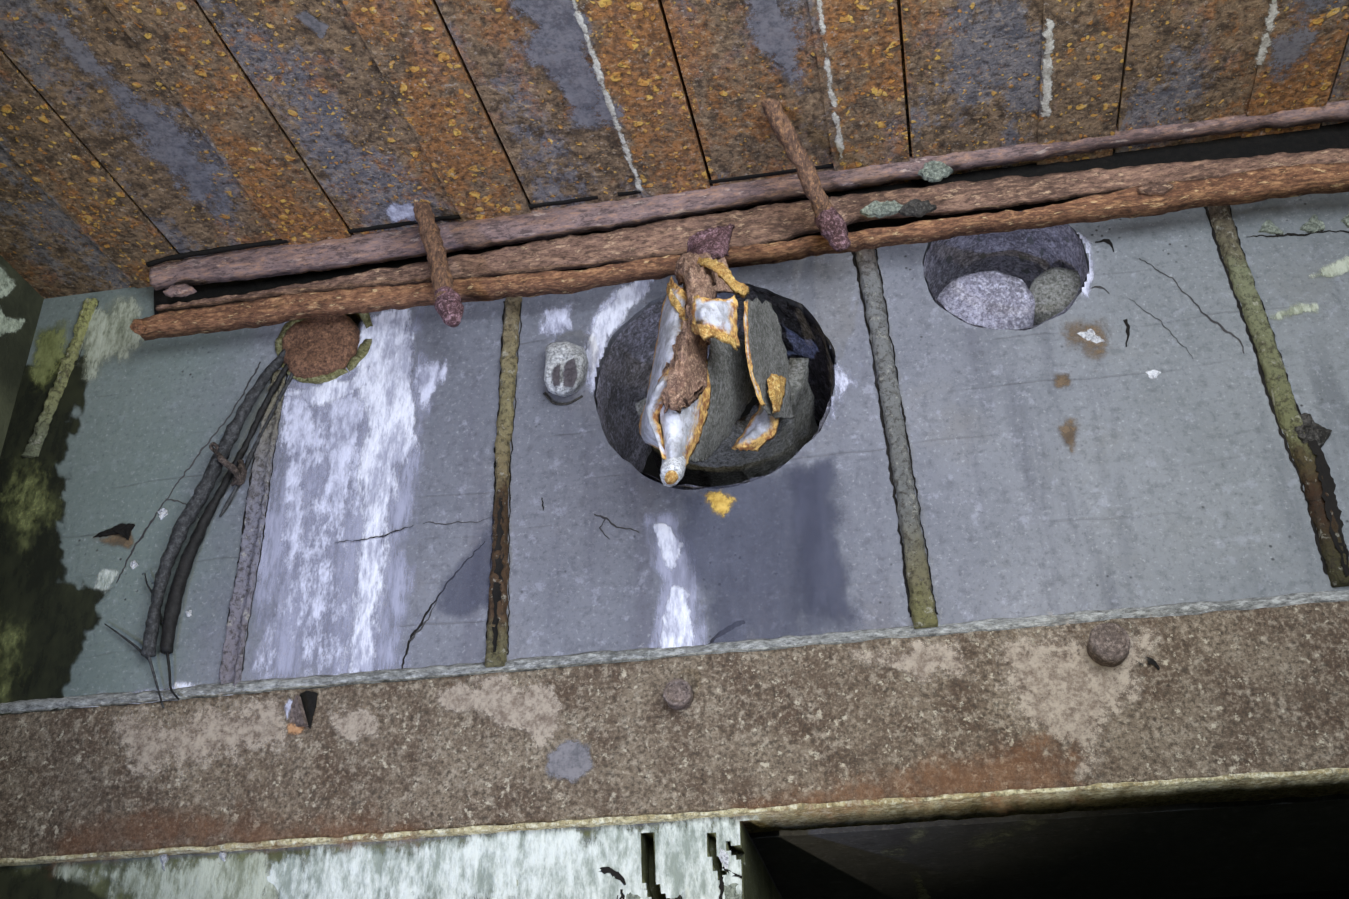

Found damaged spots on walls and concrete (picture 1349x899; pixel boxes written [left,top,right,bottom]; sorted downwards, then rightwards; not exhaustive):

peeling [0,267,25,336]
water stain [254,308,447,678]
crack [336,518,488,669]
corrosion [285,700,303,734]
water stain [0,815,759,899]
spalling [718,848,742,899]